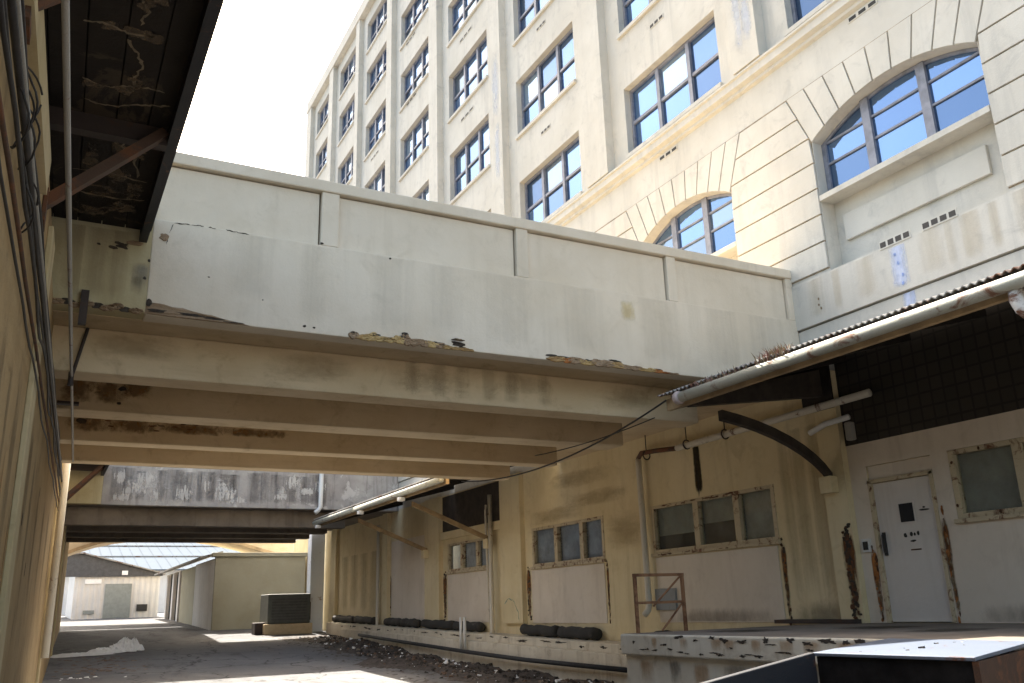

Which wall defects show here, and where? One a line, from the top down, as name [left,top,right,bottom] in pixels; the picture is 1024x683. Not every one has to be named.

peeling [144,299,249,326]
spalling [348,331,474,352]
spalling [546,354,679,375]
corrosion [941,506,961,623]
corrosion [780,537,793,625]
corrosion [871,545,884,622]
spalling [633,635,865,658]